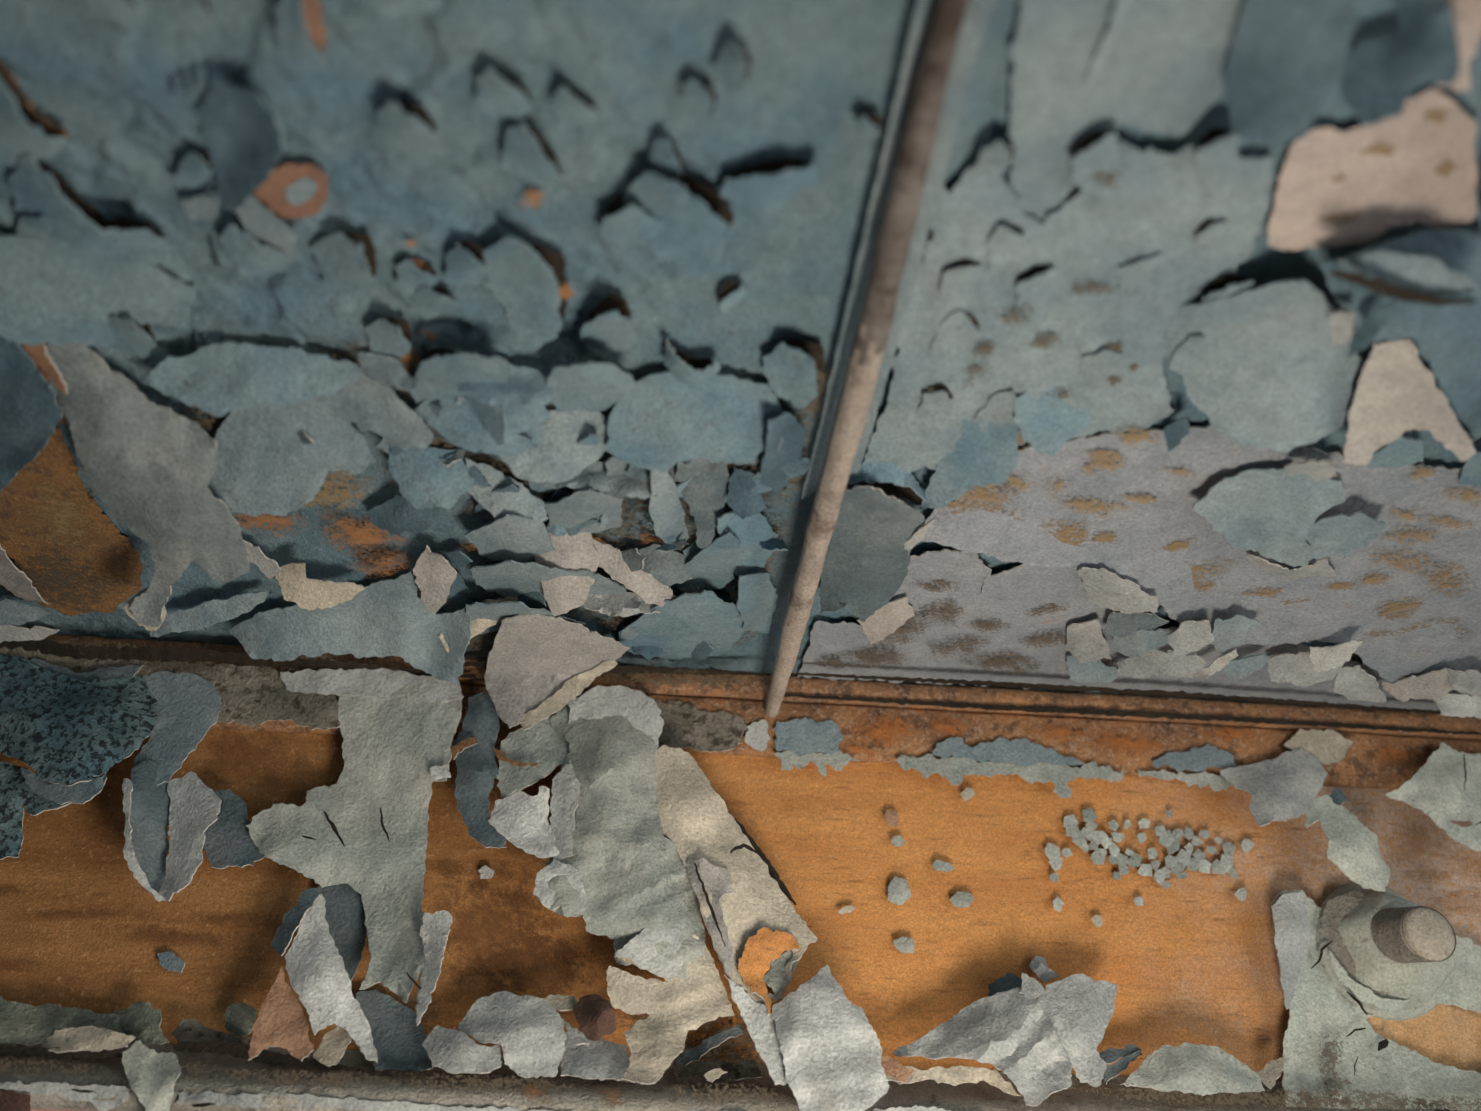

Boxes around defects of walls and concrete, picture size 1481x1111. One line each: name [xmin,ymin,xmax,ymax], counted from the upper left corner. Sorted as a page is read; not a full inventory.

peeling [0,64,197,425]
peeling [173,79,377,293]
peeling [376,100,441,152]
peeling [396,235,568,352]
peeling [474,66,565,186]
peeling [599,138,820,279]
peeling [797,0,1481,719]
rust [946,473,1029,521]
rust [1044,478,1157,546]
rust [1164,539,1229,593]
rust [1328,468,1481,595]
peeling [0,294,1481,1111]